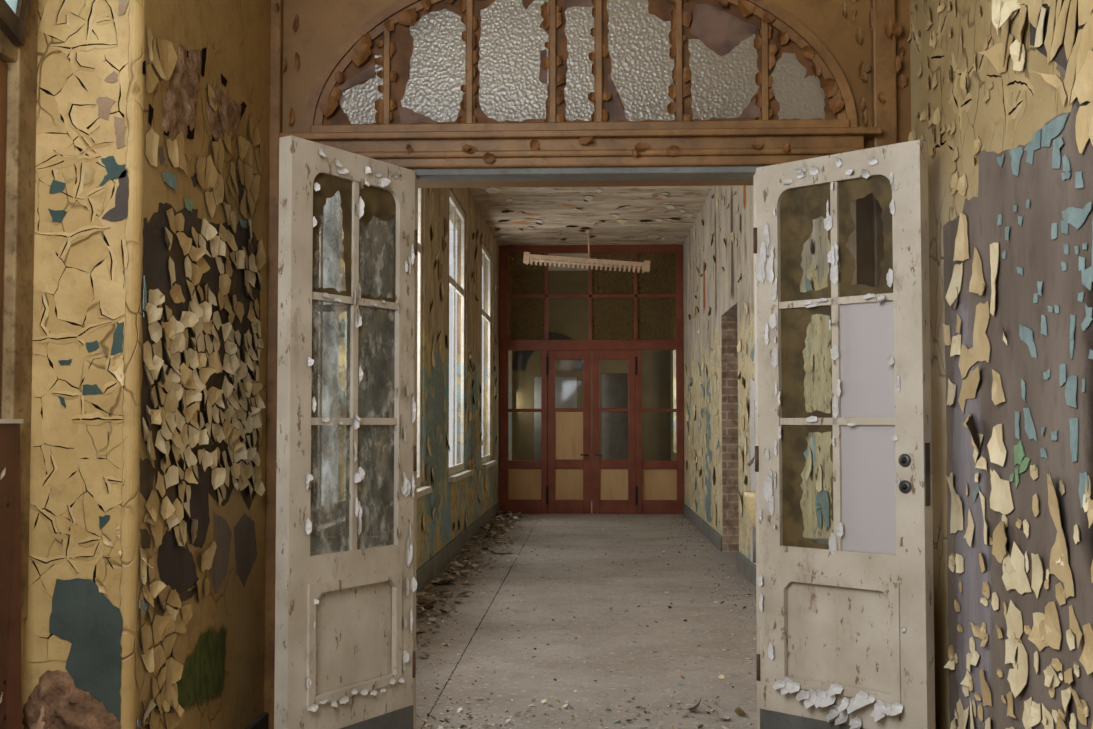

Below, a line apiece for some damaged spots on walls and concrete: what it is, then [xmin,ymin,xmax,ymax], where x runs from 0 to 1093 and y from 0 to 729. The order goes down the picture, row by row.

crack [50,0,119,71]
flaking render [136,26,266,729]
crack [911,0,1034,177]
flaking render [942,0,1093,729]